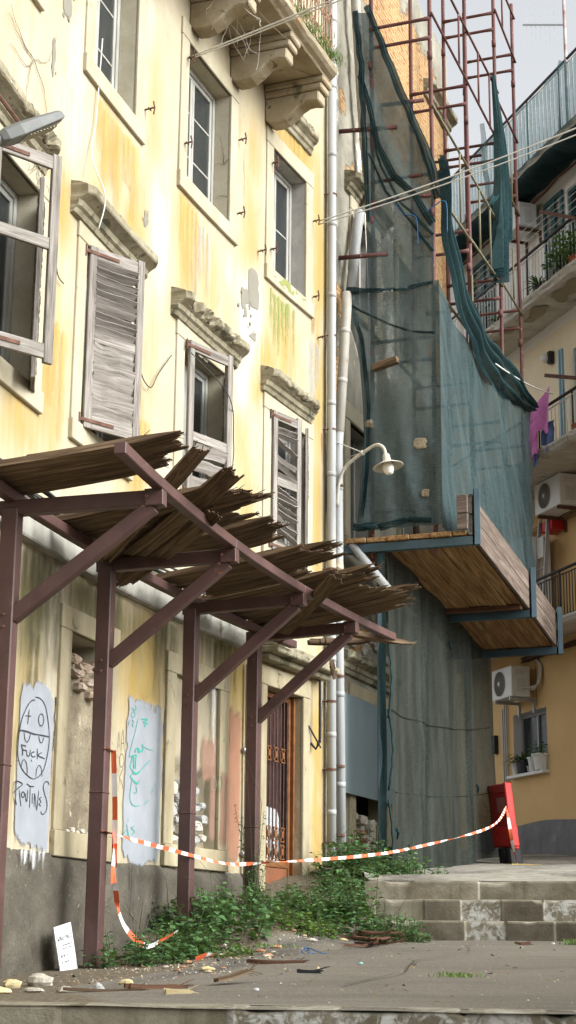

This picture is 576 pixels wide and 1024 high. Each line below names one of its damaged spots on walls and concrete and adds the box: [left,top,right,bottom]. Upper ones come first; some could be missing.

flaking render [238,268,260,342]
damp [270,288,295,344]